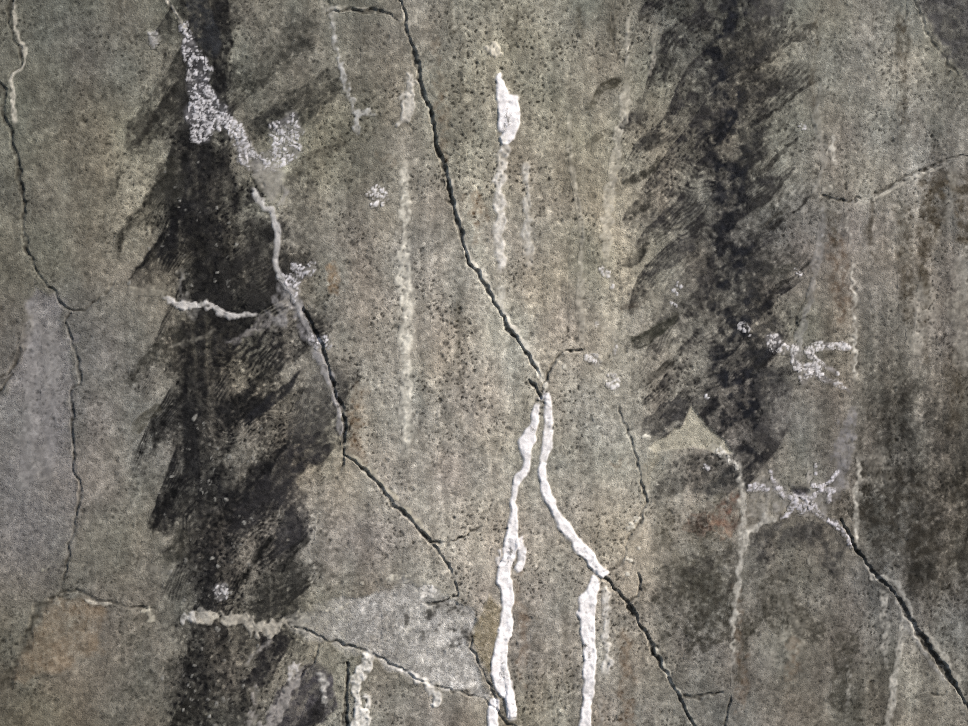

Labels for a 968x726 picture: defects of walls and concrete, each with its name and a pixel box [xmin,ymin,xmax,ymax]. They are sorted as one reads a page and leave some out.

crack [164,0,184,24]
crack [0,0,158,693]
leakage [99,0,443,726]
crack [302,301,482,608]
crack [292,627,523,726]
leakage [435,281,467,477]
crack [319,0,657,396]
crack [601,404,732,726]
leakage [484,0,968,726]
crack [792,83,968,376]
crack [839,518,968,713]